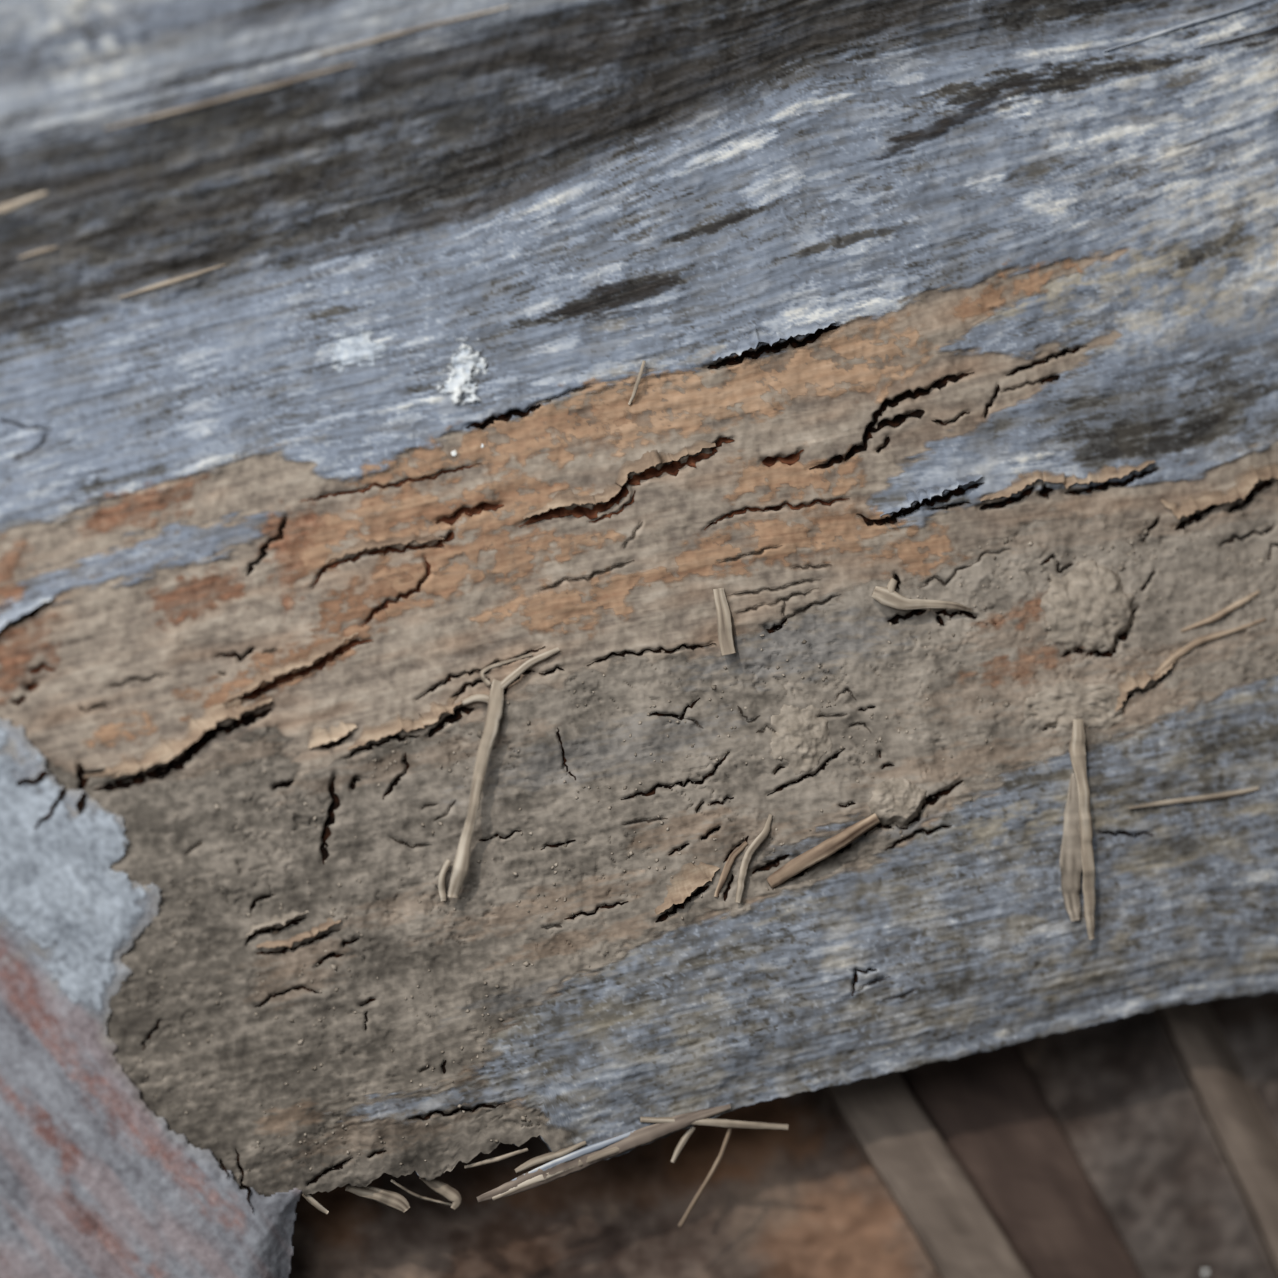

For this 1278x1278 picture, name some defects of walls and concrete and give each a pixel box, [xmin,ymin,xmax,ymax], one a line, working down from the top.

leakage [437,338,487,405]
crack [465,386,591,429]
crack [707,326,840,369]
crack [762,345,1087,469]
peeling [0,249,1278,780]
crack [704,467,1158,530]
crack [12,437,734,828]
crack [320,643,716,864]
crack [621,751,963,923]
peeling [246,910,341,948]
crack [246,894,359,1007]
peeling [621,862,782,952]